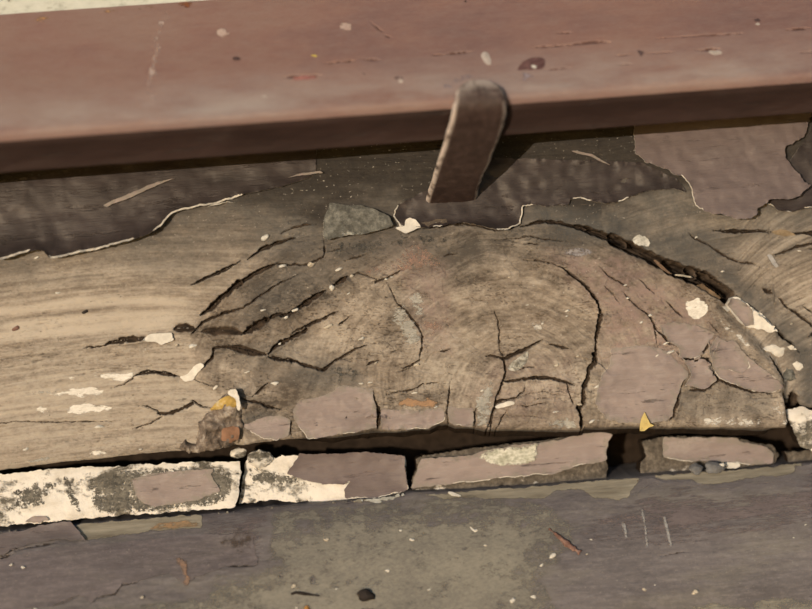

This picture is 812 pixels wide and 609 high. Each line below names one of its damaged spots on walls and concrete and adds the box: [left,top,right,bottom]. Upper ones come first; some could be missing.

peeling [0,149,323,260]
peeling [323,113,812,240]
crack [86,336,145,349]
crack [116,370,177,387]
crack [134,400,210,429]
crack [174,224,450,427]
peeling [243,385,474,441]
crack [430,220,799,430]
peeling [595,322,784,423]
peeling [725,297,778,333]
crack [762,288,812,351]
peeling [0,432,812,609]